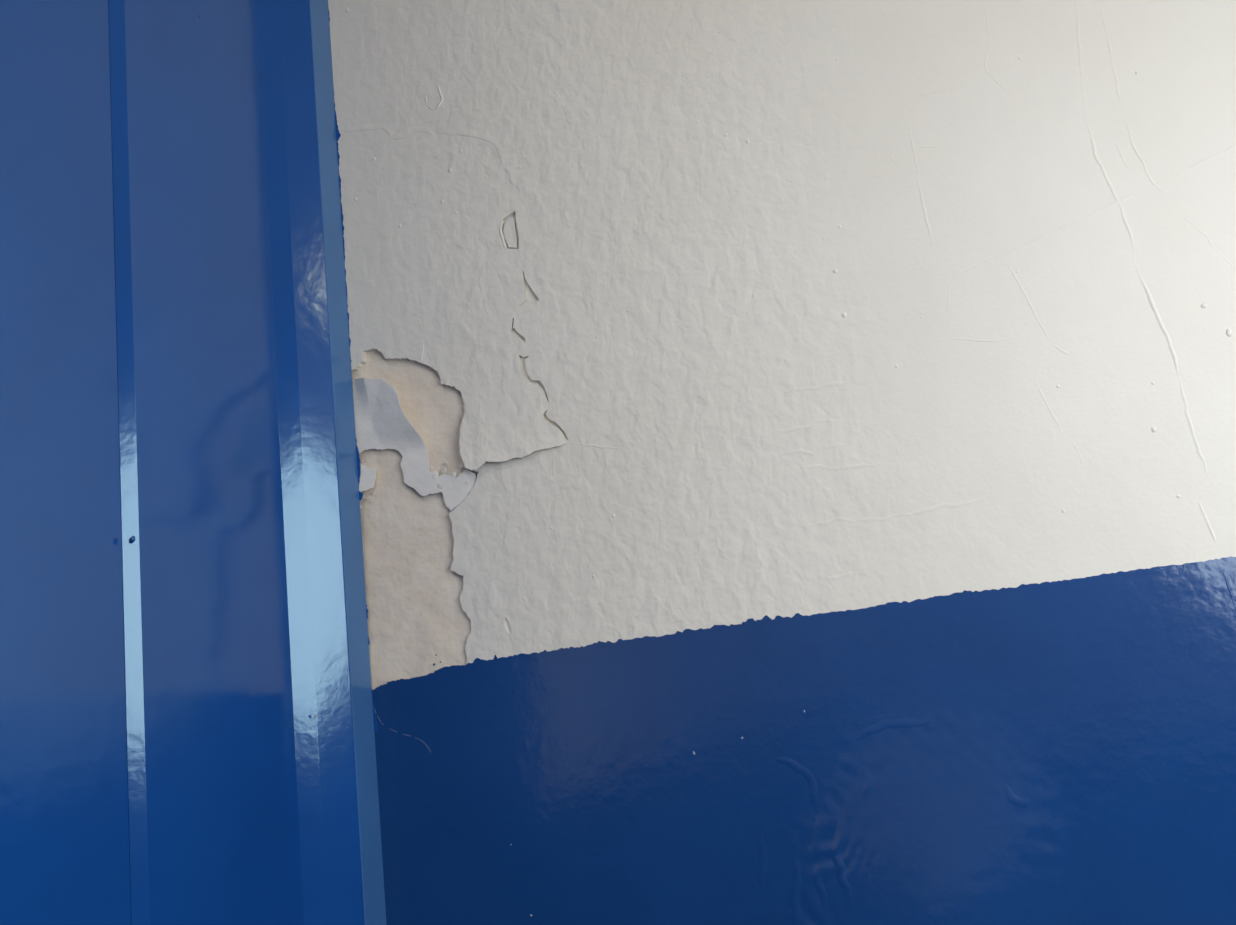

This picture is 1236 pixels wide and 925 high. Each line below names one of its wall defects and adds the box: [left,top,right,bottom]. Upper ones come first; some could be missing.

peeling [352,335,566,690]